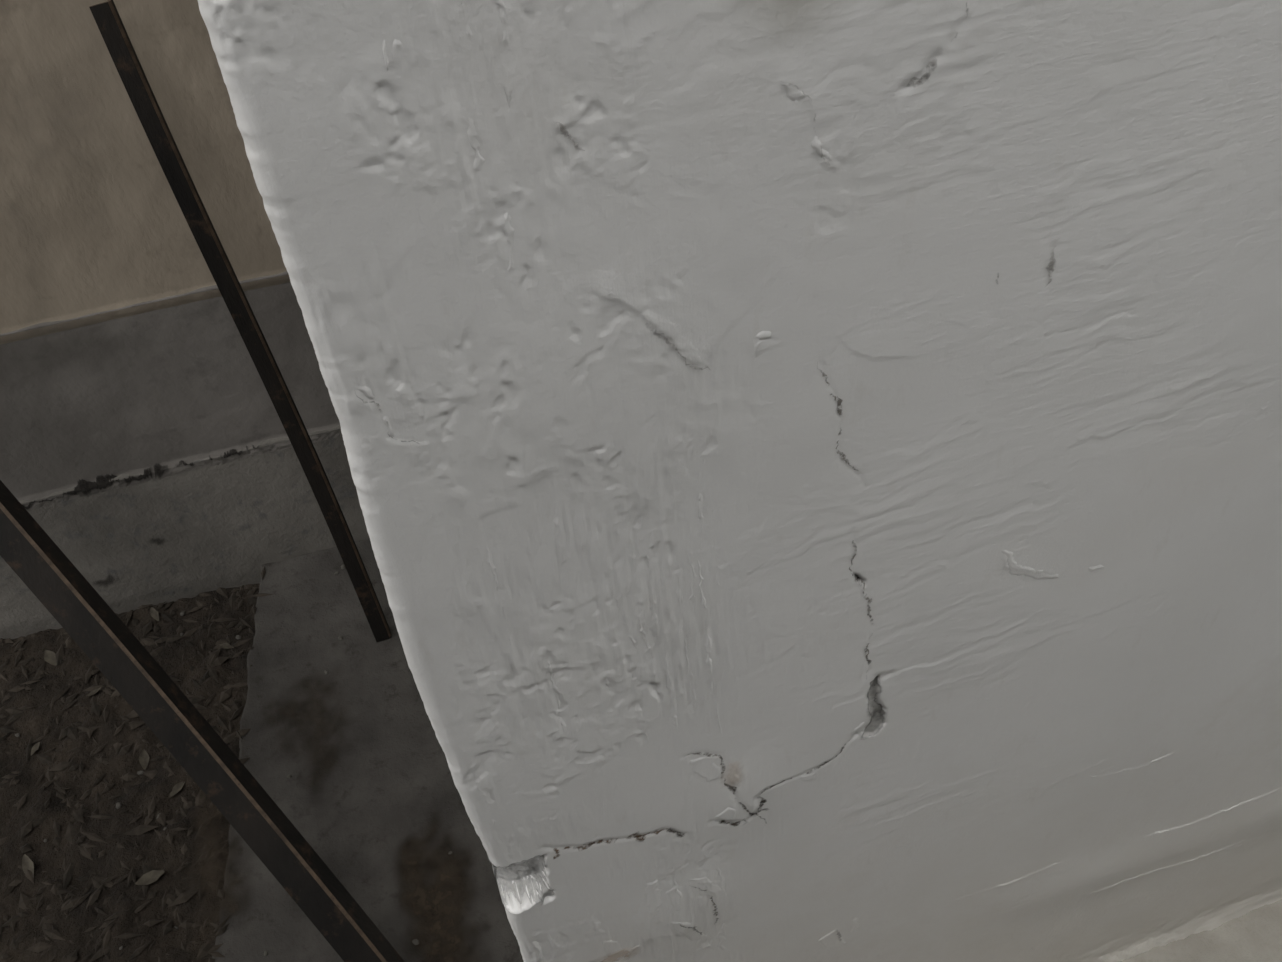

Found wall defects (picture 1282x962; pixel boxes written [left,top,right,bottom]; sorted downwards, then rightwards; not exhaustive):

crack [822,372,857,470]
crack [849,545,873,663]
spalling [861,676,885,738]
crack [689,722,865,826]
spalling [487,854,554,903]
crack [554,828,684,859]